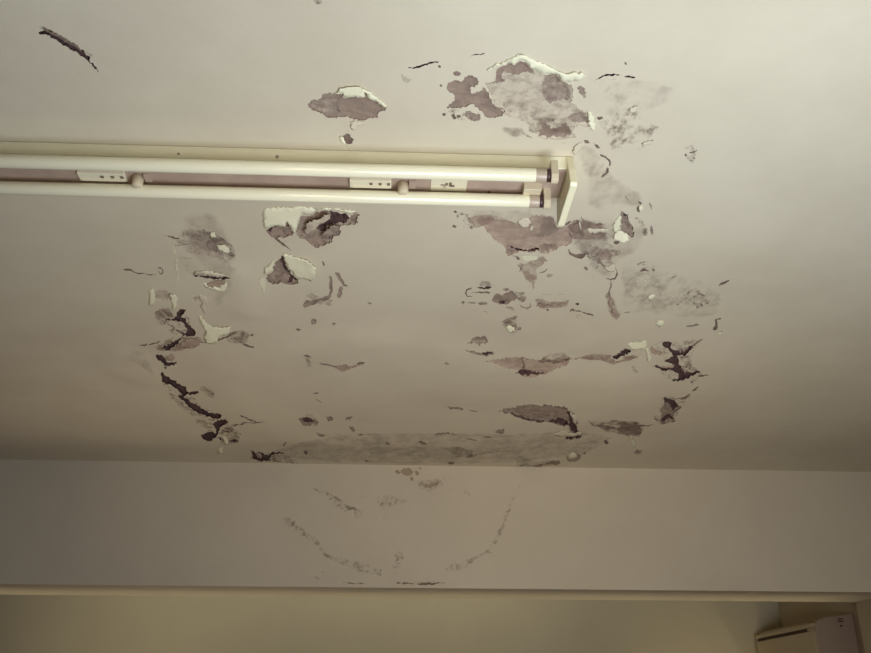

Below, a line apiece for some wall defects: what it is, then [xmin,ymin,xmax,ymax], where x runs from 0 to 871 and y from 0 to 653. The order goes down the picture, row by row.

crack [38,29,98,71]
peeling [308,86,387,149]
peeling [440,54,596,140]
peeling [165,224,233,283]
spalling [259,206,360,292]
peeling [452,195,653,272]
peeling [149,288,178,318]
crack [138,309,297,463]
spalling [465,336,572,378]
crack [575,318,723,383]
spalling [498,404,582,440]
peeling [589,387,698,453]